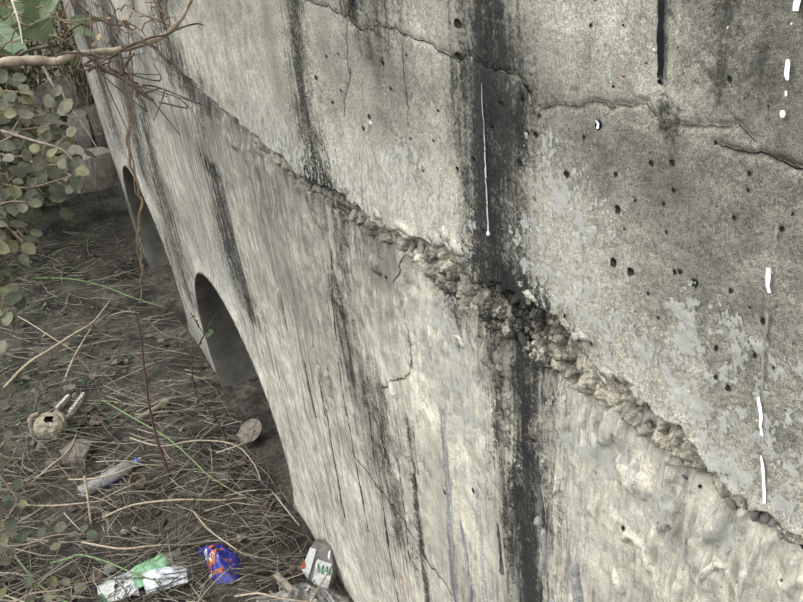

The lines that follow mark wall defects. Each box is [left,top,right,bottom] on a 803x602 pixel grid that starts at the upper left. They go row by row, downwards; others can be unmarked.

damp [281,0,431,602]
crack [381,311,412,388]
crack [357,460,455,601]
damp [433,0,574,602]
spalling [223,62,803,572]
crack [307,0,803,169]